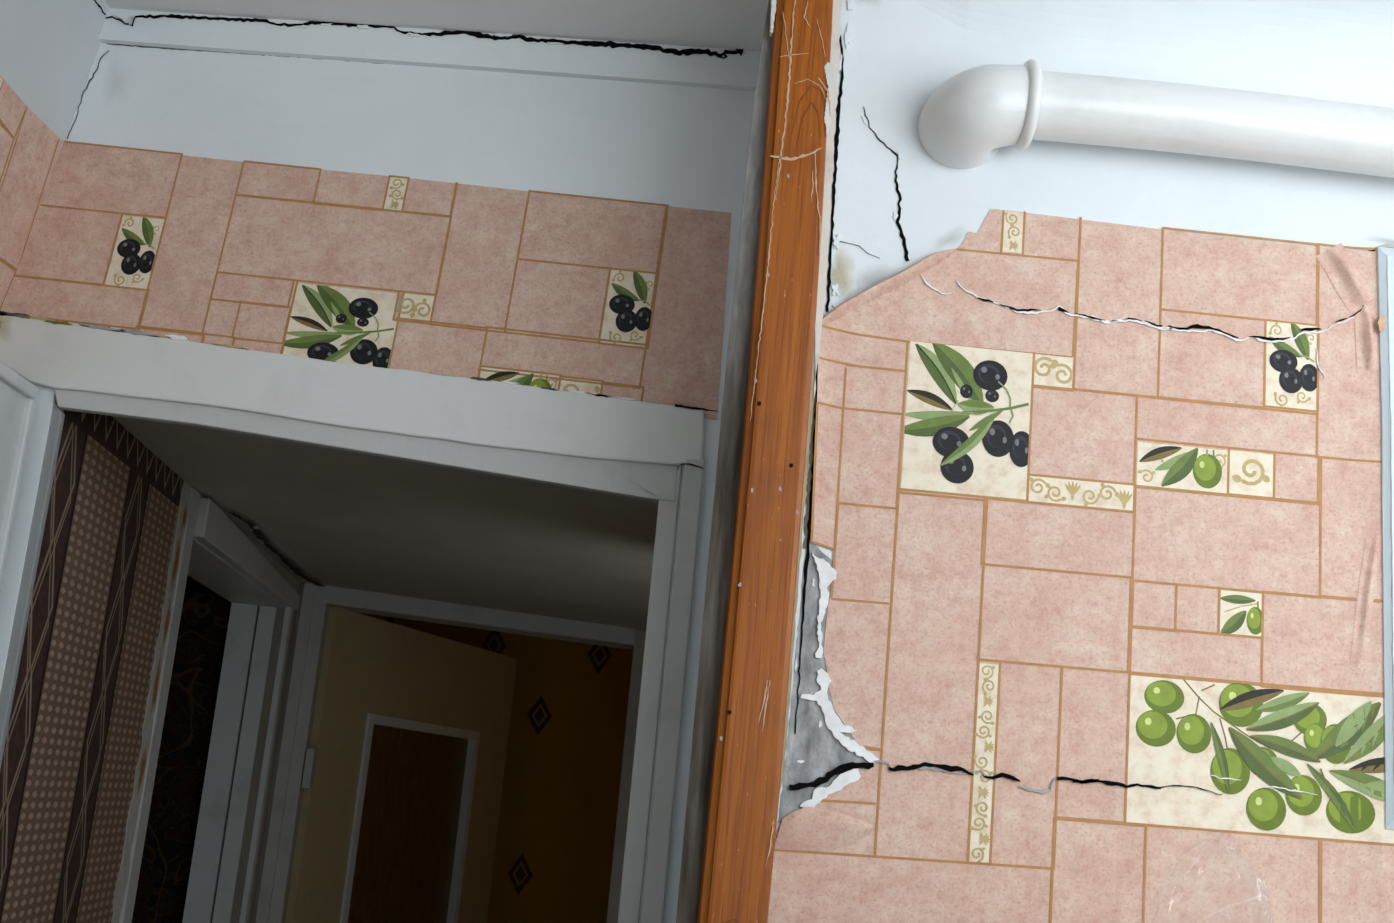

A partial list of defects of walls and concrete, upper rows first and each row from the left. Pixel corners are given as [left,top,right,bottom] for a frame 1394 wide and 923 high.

crack [67,0,744,140]
crack [826,0,1364,378]
crack [795,364,818,734]
peeling [774,543,879,851]
crack [789,760,1318,795]